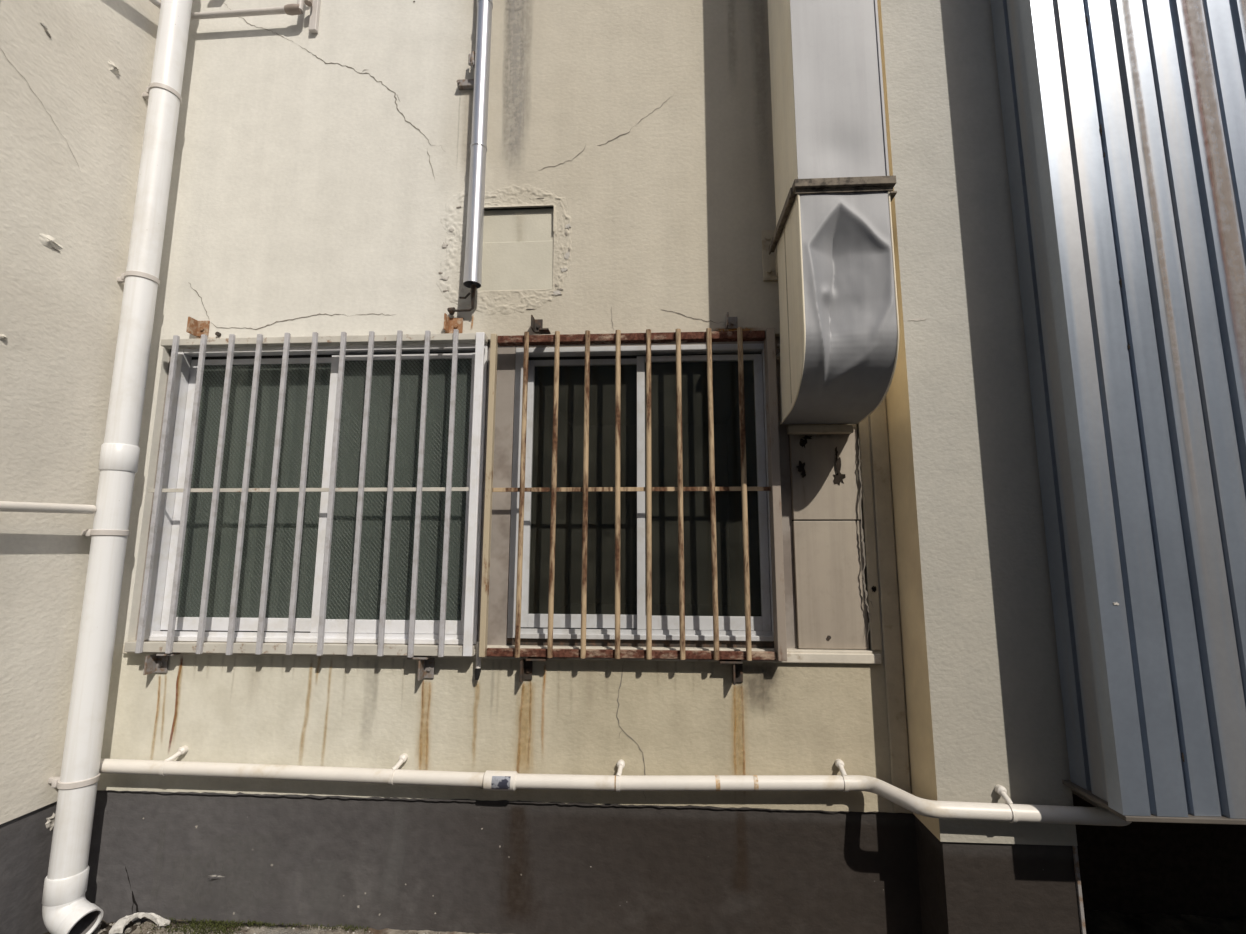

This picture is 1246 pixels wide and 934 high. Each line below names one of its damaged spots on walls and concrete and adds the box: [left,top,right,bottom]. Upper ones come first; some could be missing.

crack [224,3,435,178]
crack [541,96,672,170]
crack [188,282,396,330]
spalling [436,184,572,315]
rust [156,659,183,743]
crack [616,668,646,798]